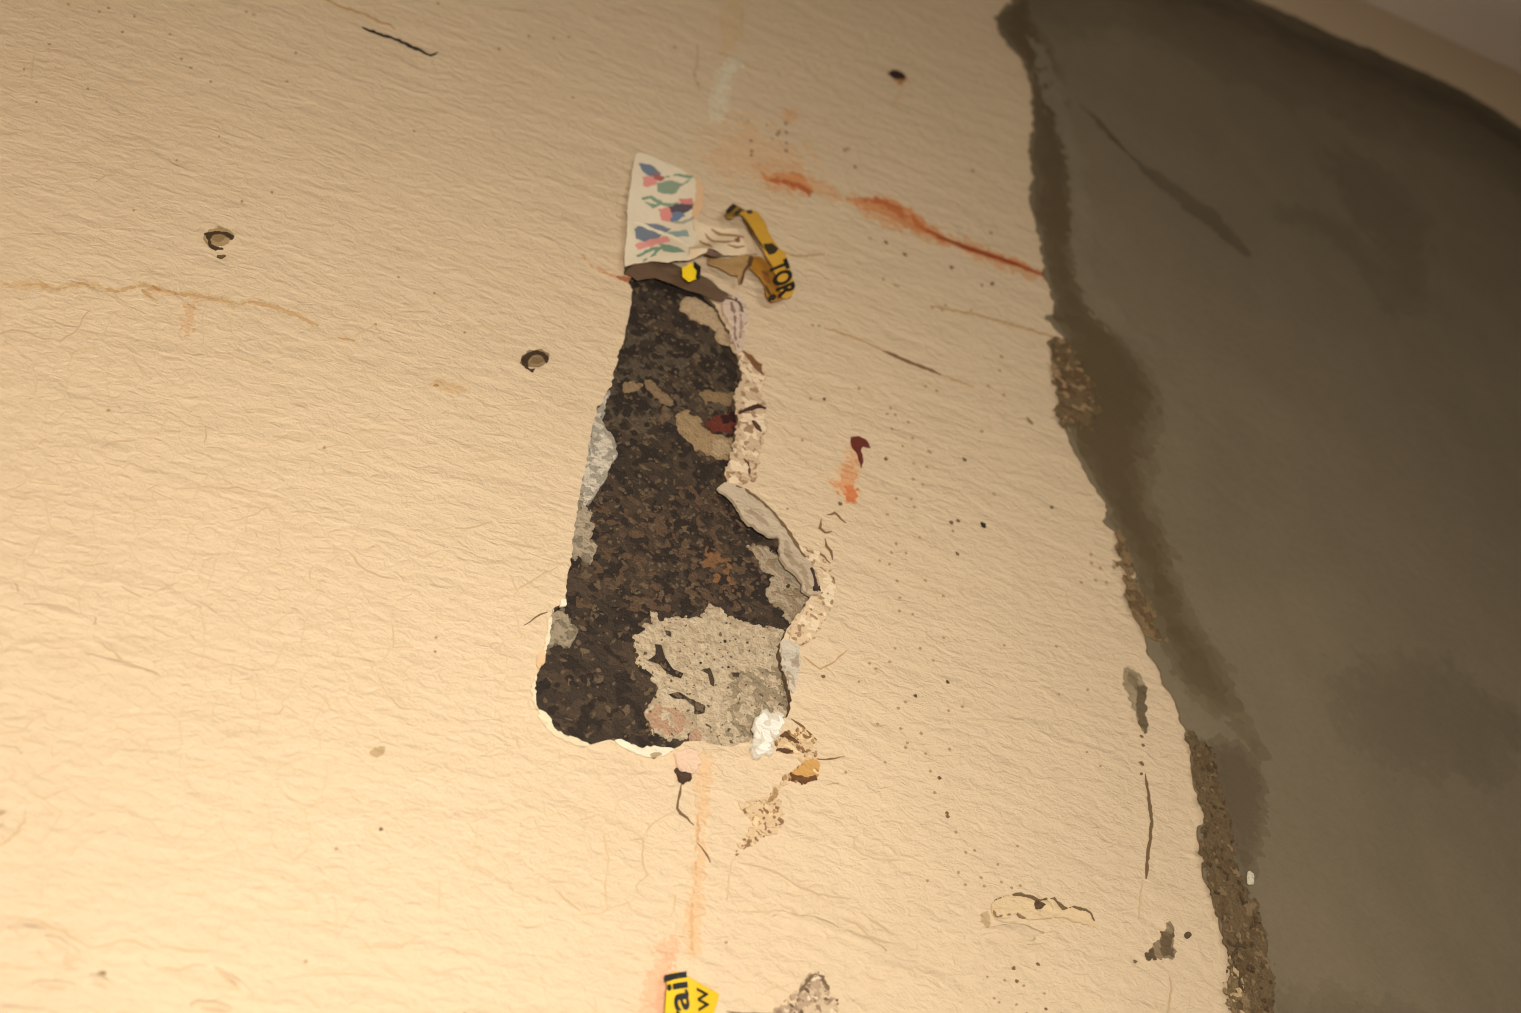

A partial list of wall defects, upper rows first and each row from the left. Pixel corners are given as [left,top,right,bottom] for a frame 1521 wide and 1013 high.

rust [751,158,1046,282]
crack [933,306,1054,338]
crack [824,328,974,388]
crack [244,408,388,476]
flaking render [535,273,820,856]
crack [10,606,158,676]
crack [284,243,899,982]
spalling [980,892,1097,928]
crack [7,919,221,989]
spalling [773,971,839,1013]